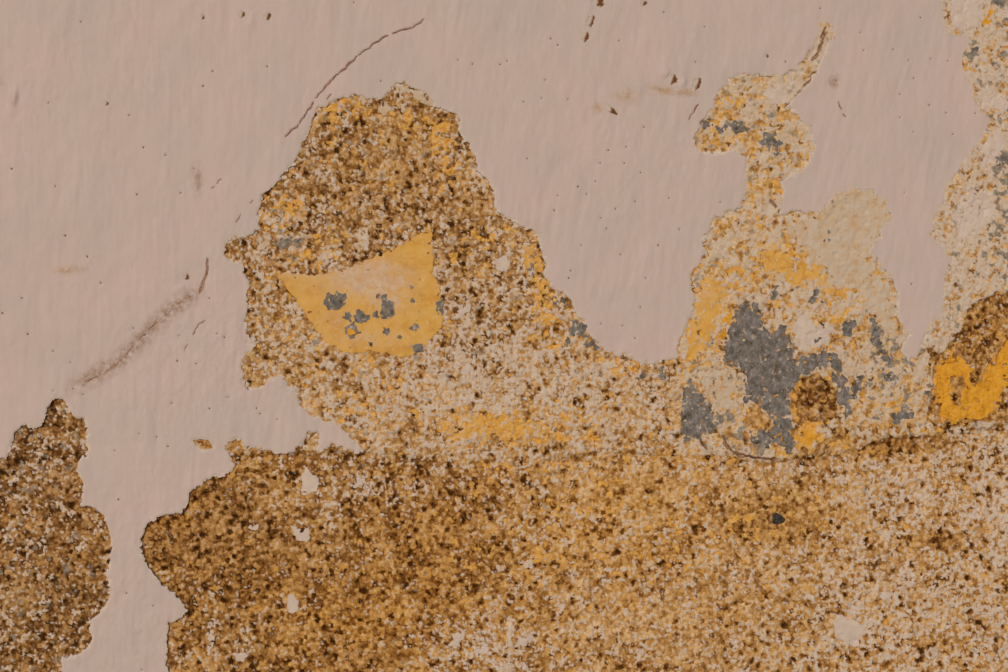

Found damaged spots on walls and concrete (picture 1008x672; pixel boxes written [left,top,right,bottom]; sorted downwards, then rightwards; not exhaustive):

flaking render [224,0,1008,465]
flaking render [0,399,113,672]
spalling [140,291,1008,672]